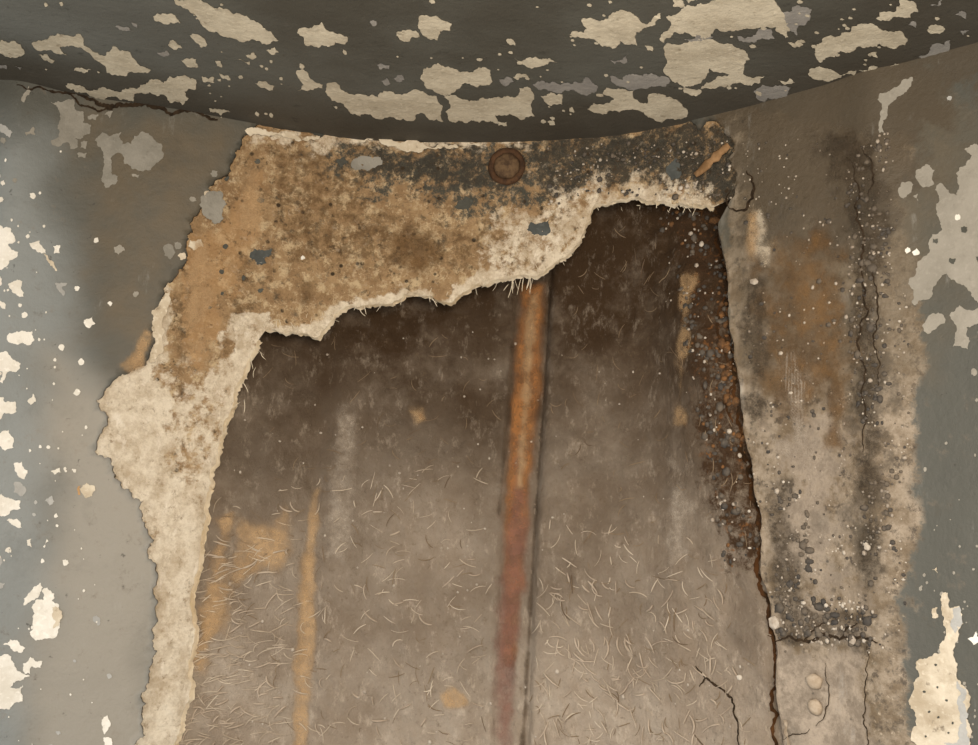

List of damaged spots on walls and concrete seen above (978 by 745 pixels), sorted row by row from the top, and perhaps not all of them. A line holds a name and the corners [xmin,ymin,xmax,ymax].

peeling [0,34,231,188]
crack [17,84,218,121]
spalling [95,0,812,745]
leakage [749,211,770,264]
crack [846,149,881,452]
peeling [898,144,978,349]
rust [294,513,318,745]
rust [500,285,542,735]
crack [695,666,739,745]
crack [715,296,878,745]
leakage [771,480,864,644]
peeling [909,592,978,745]